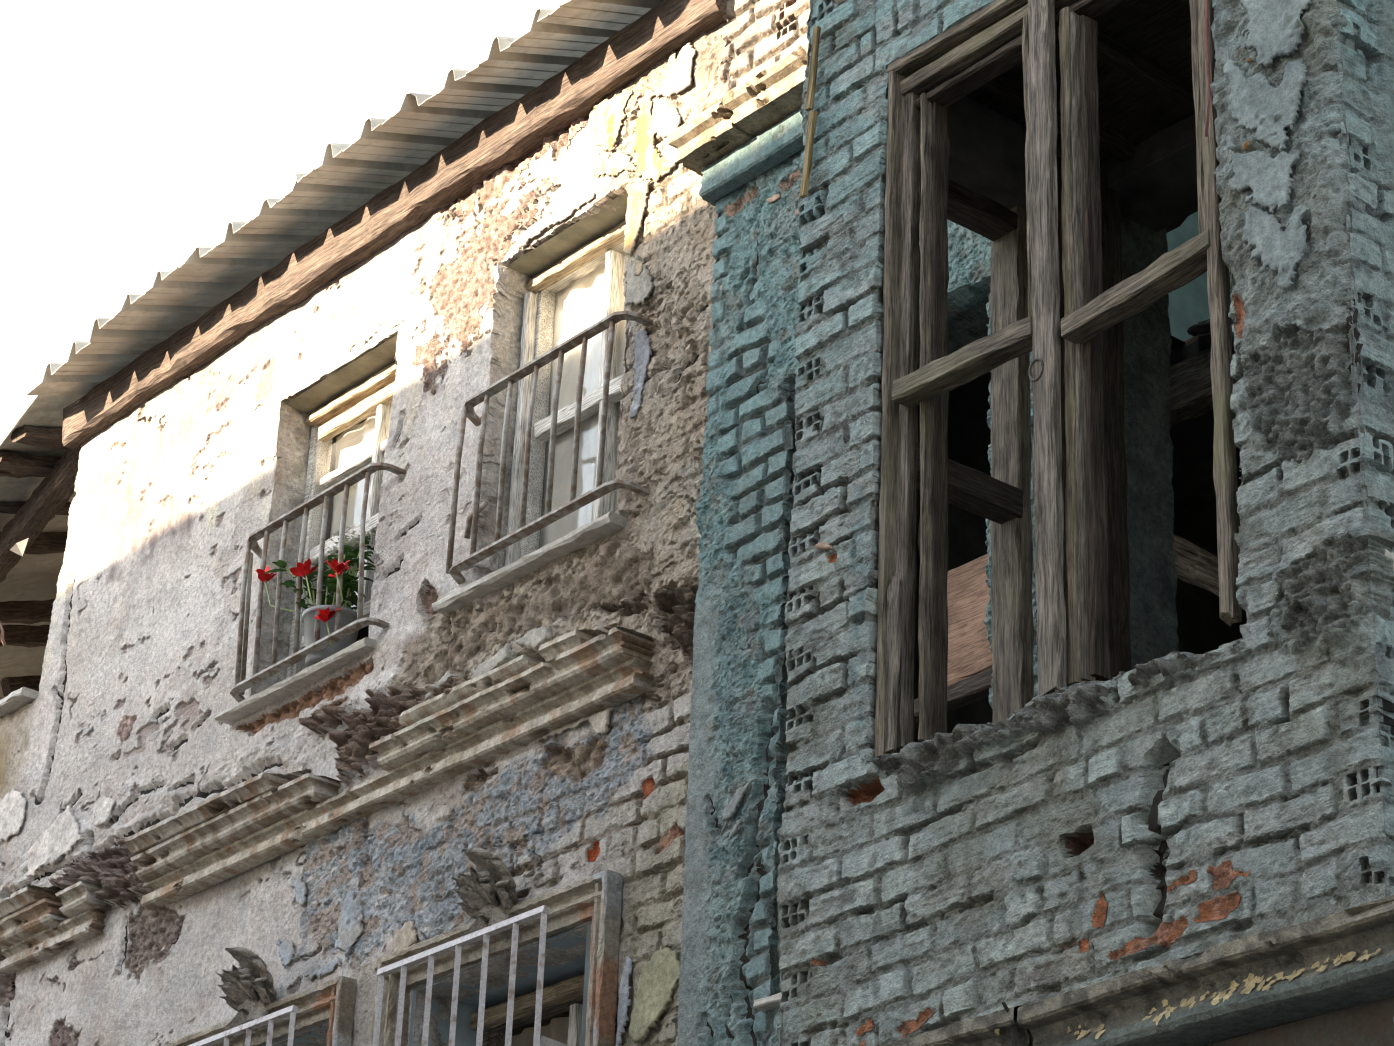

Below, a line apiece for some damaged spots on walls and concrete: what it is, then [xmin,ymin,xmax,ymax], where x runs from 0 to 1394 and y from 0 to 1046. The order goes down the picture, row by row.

flaking render [1223,0,1311,291]
spalling [406,43,696,395]
spalling [236,662,374,736]
spalling [534,707,613,782]
flaking render [0,788,26,843]
flaking render [27,796,115,877]
spalling [124,905,185,983]
peeling [276,886,363,980]
flaking render [587,841,600,862]
crack [706,708,777,1046]
crack [1148,758,1177,920]
flaking render [1107,860,1250,961]